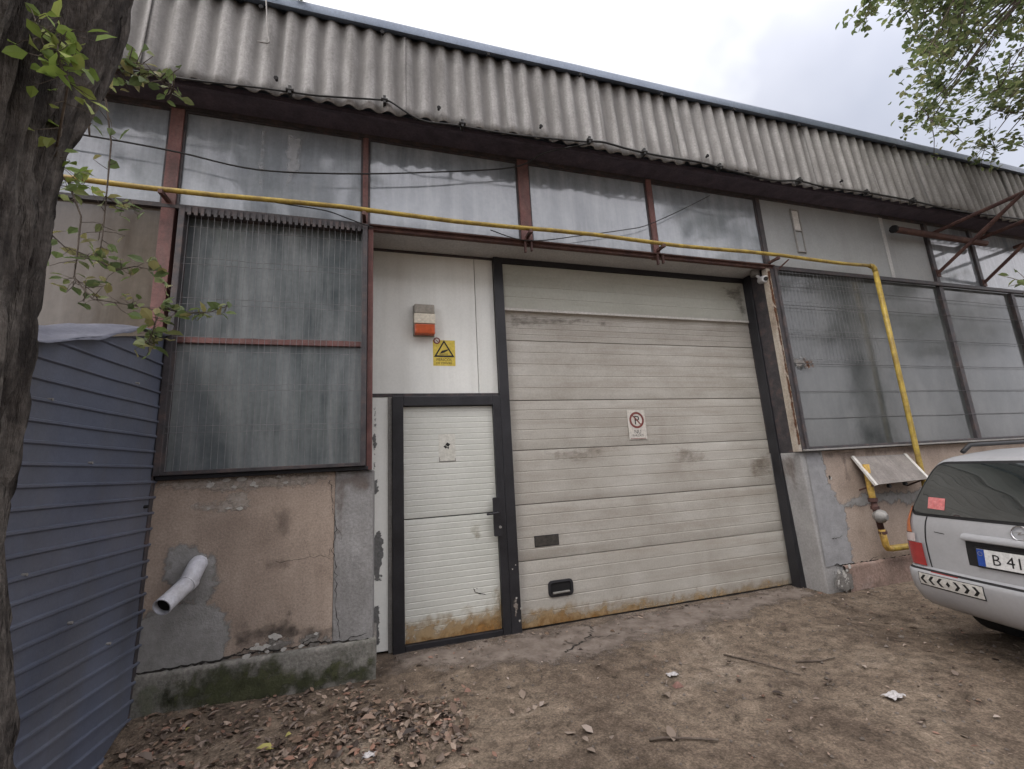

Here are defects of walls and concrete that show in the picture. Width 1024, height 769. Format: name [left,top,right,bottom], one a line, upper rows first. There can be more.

corrosion [768,271,814,444]
peeling [158,472,329,493]
crack [136,481,369,675]
peeling [374,531,384,581]
spalling [230,632,332,659]
corrosion [405,605,502,644]
corrosion [522,581,781,629]